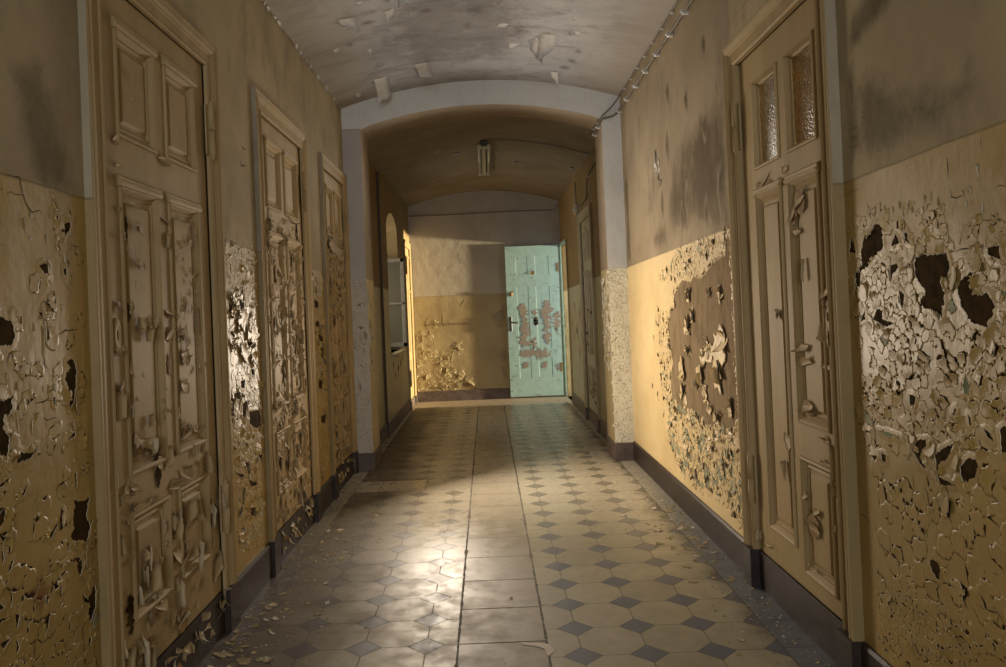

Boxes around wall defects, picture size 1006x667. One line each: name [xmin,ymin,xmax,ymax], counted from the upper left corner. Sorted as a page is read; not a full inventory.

peeling [371,76,391,104]
peeling [509,32,559,88]
crack [1,174,45,219]
peeling [35,190,78,291]
peeling [846,164,1006,348]
peeling [43,352,83,416]
peeling [314,296,325,394]
peeling [414,319,487,391]
peeling [651,225,739,503]
peeling [876,361,1006,514]
peeling [59,484,100,629]
peeling [167,587,251,667]